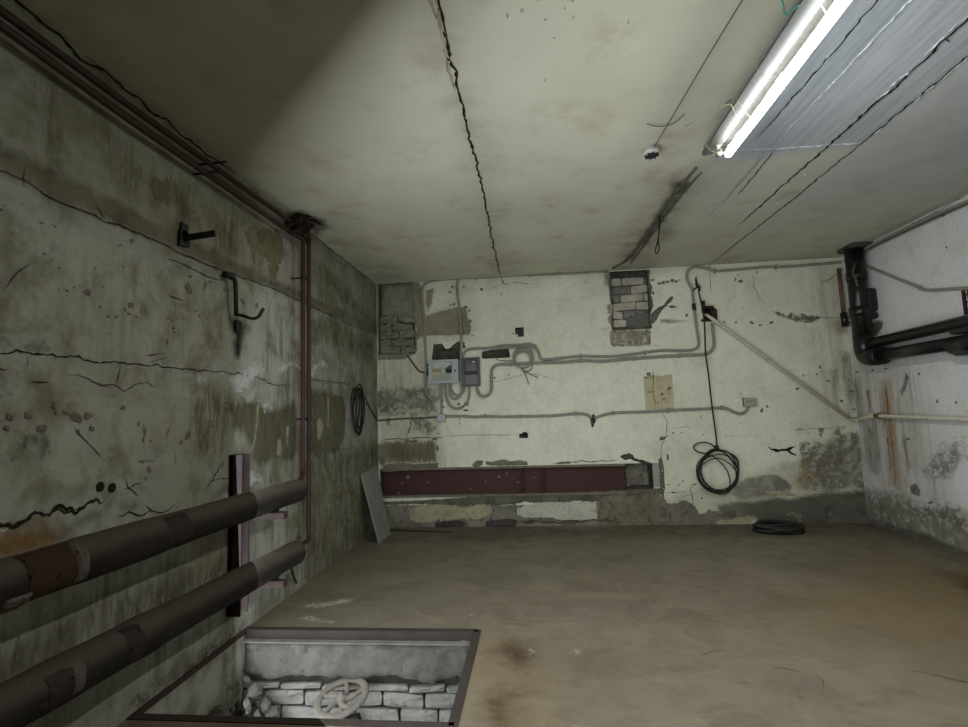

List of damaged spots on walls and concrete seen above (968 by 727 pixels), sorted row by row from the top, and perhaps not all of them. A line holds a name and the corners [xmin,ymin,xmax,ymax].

crack [15,0,230,169]
crack [437,0,527,289]
crack [0,170,374,392]
peeling [607,270,680,347]
crack [0,481,173,533]
water stain [196,364,297,486]
water stain [303,391,436,580]
peeling [385,501,600,528]
water stain [720,462,968,557]